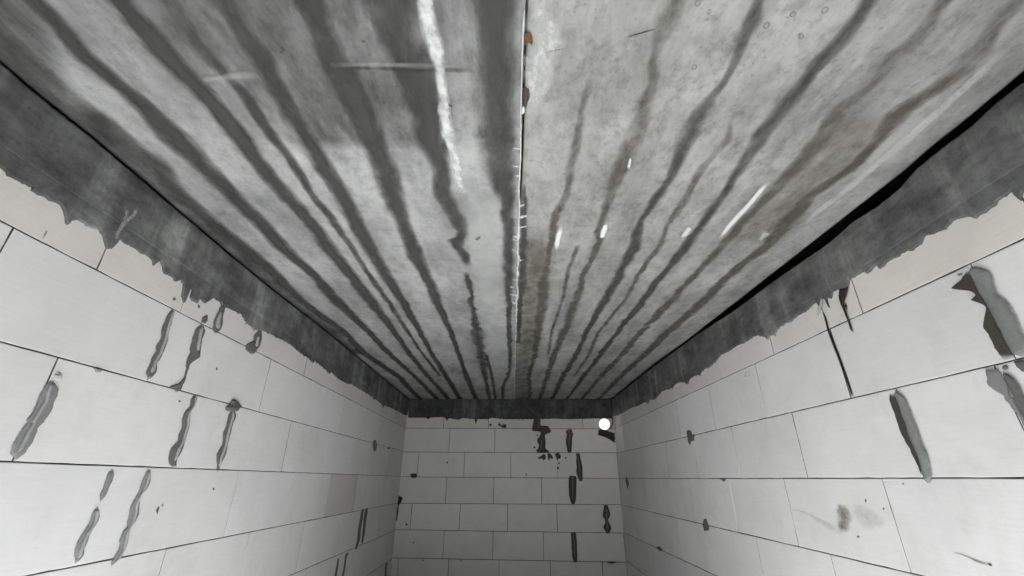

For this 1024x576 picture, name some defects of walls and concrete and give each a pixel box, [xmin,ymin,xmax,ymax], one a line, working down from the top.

corrosion [522,87,530,114]
leakage [0,0,960,399]
crack [823,313,853,395]